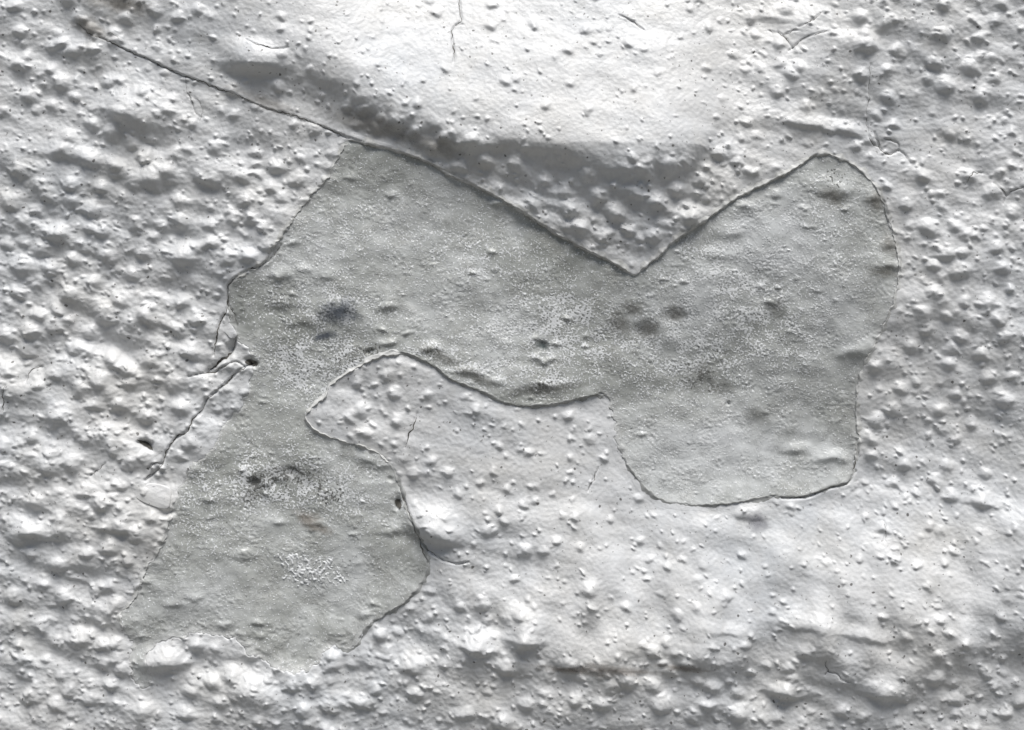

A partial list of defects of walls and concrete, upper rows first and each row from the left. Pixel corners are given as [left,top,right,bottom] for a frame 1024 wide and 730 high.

peeling [117,137,902,689]